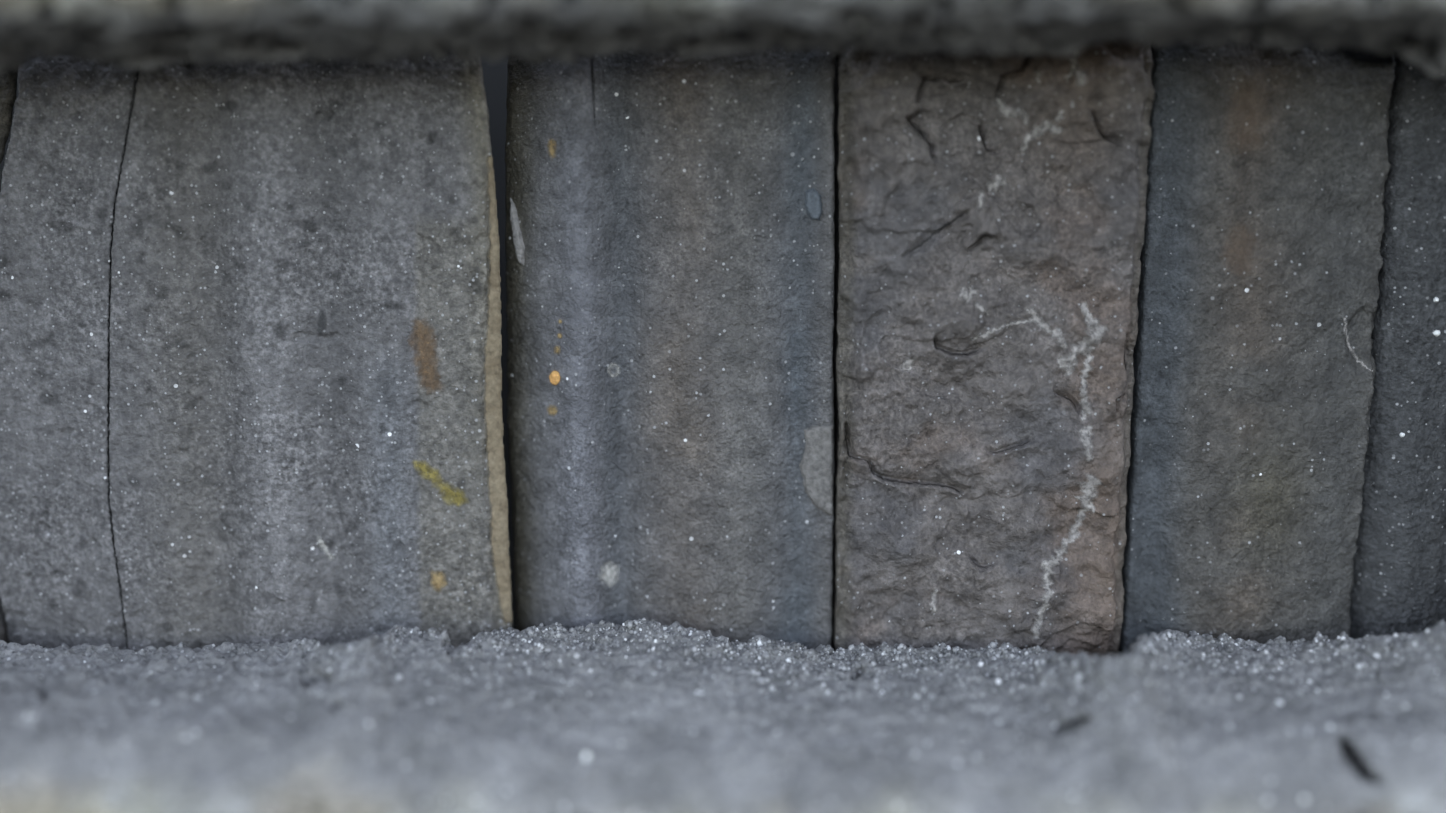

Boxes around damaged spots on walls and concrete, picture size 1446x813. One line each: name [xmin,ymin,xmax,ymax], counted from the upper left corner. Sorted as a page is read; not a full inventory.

crack [107,69,139,638]